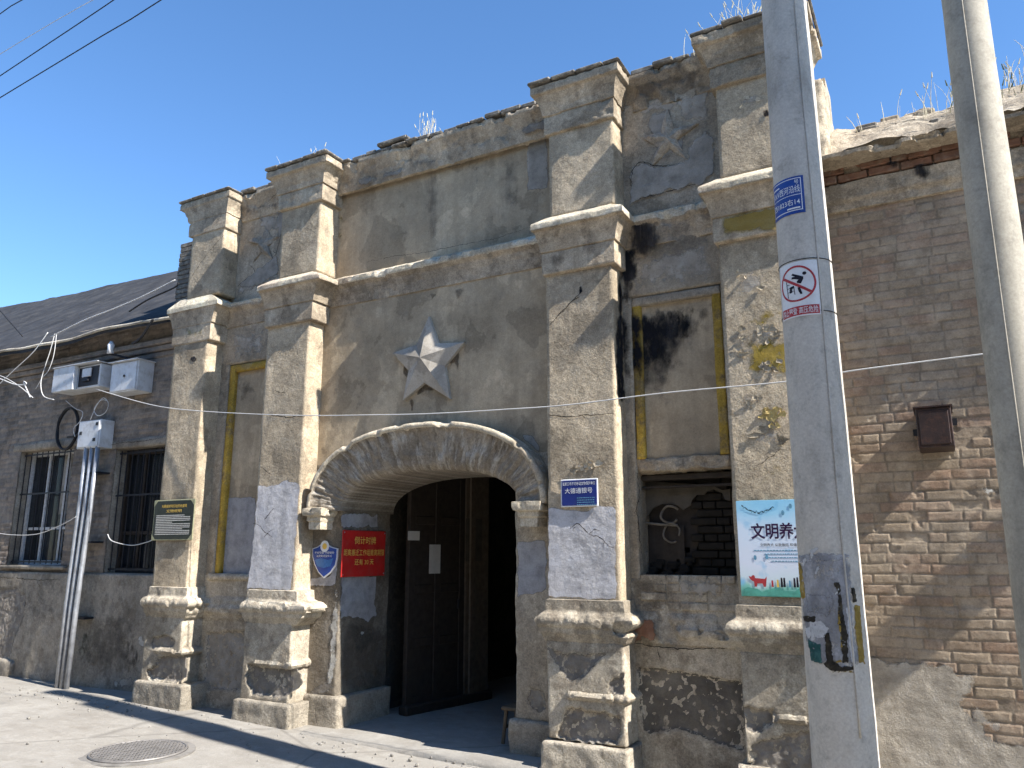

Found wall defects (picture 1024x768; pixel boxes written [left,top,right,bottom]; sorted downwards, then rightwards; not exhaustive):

crack [630,162,695,199]
water stain [621,223,659,299]
water stain [623,315,643,374]
peeling [733,324,783,357]
spalling [548,647,605,681]
spalling [558,708,622,744]
spalling [609,667,812,768]
flaking render [870,657,1024,768]